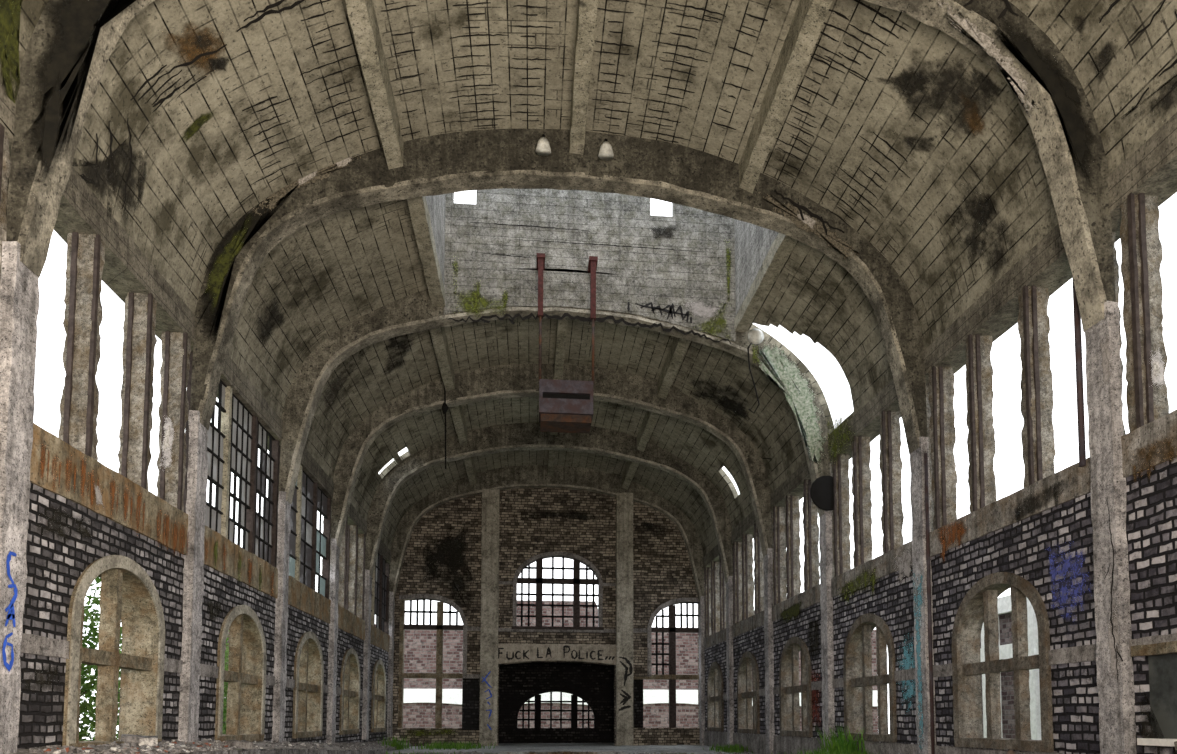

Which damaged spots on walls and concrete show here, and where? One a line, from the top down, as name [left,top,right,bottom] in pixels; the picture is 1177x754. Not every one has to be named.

damp [31,0,136,179]
damp [167,26,228,71]
crack [77,0,370,209]
crack [381,2,555,136]
damp [880,61,1003,152]
damp [1091,43,1112,81]
damp [1150,76,1177,115]
damp [201,193,288,335]